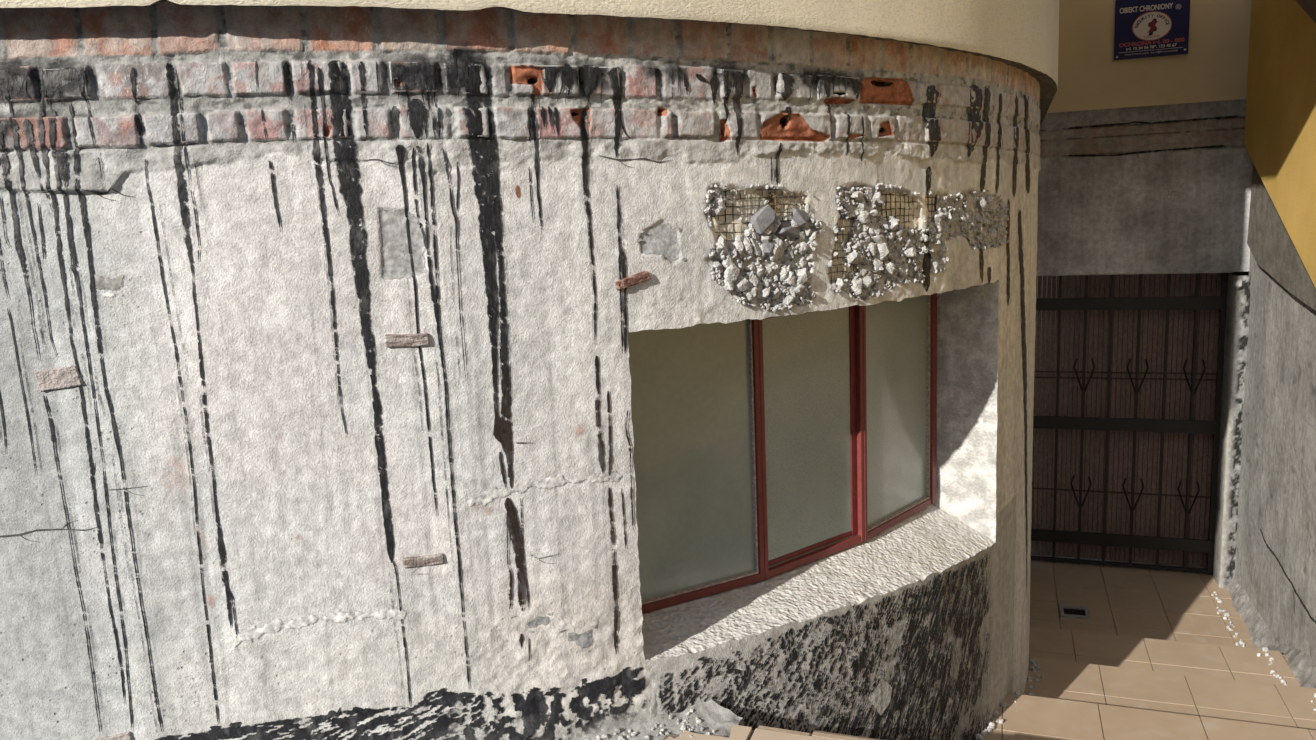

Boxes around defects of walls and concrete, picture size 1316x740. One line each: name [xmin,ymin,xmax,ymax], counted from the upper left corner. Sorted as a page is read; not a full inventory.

spalling [510,65,543,95]
spalling [760,112,830,142]
spalling [824,77,914,105]
crack [81,186,132,201]
leakage [527,63,631,354]
peeling [636,223,686,263]
spalling [704,183,1010,312]
leakage [0,61,162,732]
leakage [130,63,237,725]
leakage [283,45,533,704]
crack [0,520,96,542]
leakage [595,355,634,654]